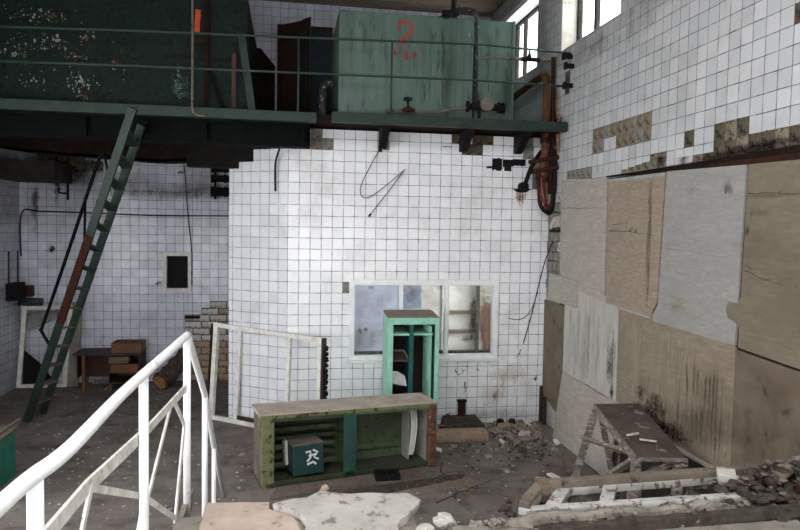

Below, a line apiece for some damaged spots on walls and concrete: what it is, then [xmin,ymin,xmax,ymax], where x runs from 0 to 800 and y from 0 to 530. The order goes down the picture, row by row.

peeling [311,128,334,150]
peeling [592,111,652,155]
peeling [684,116,800,163]
peeling [567,166,592,179]
peeling [621,151,667,174]
flaking render [452,134,561,298]
flaking render [185,301,229,381]
water stain [645,399,700,441]